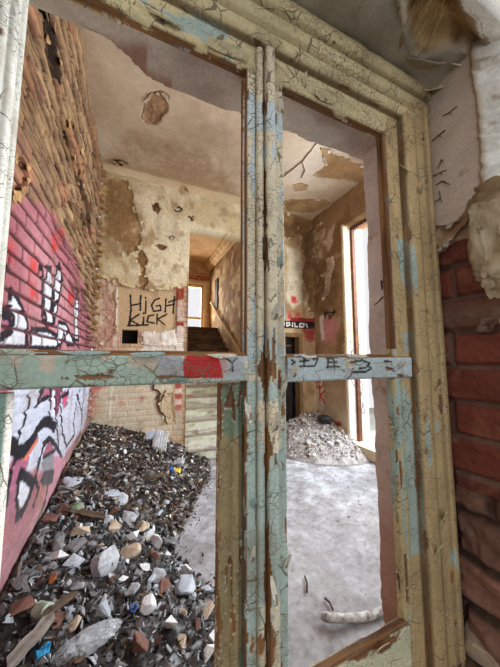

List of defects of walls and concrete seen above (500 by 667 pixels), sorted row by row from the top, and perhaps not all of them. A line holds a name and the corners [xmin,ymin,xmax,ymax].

flaking render [142,90,171,125]
crack [284,143,317,178]
peeling [313,147,364,183]
flaking render [436,204,469,252]
flaking render [56,168,186,358]
peeling [283,183,335,314]
spalling [87,388,97,418]
crack [152,385,167,423]
peeling [244,397,253,426]
peeling [270,576,278,610]